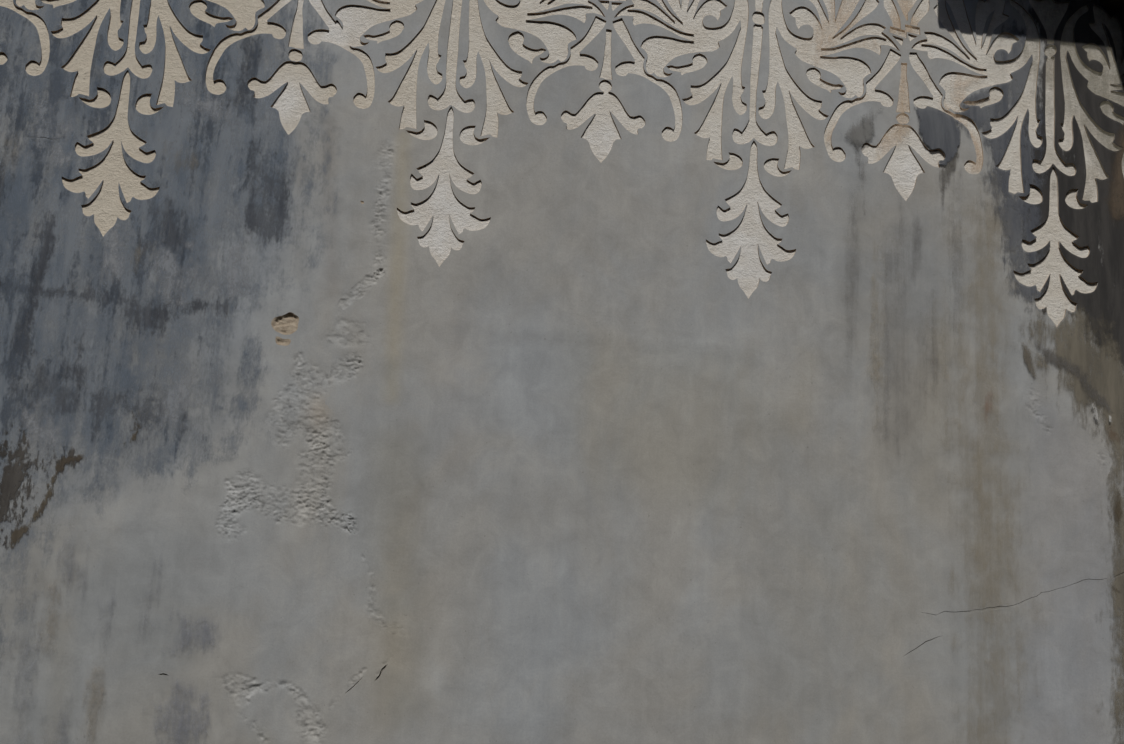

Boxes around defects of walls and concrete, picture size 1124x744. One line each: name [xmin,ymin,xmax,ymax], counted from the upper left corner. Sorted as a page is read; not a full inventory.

damp [0,0,290,551]
damp [1109,133,1124,219]
spalling [212,312,366,544]
spalling [214,666,368,744]
crack [906,572,1124,655]
damp [1023,307,1124,744]